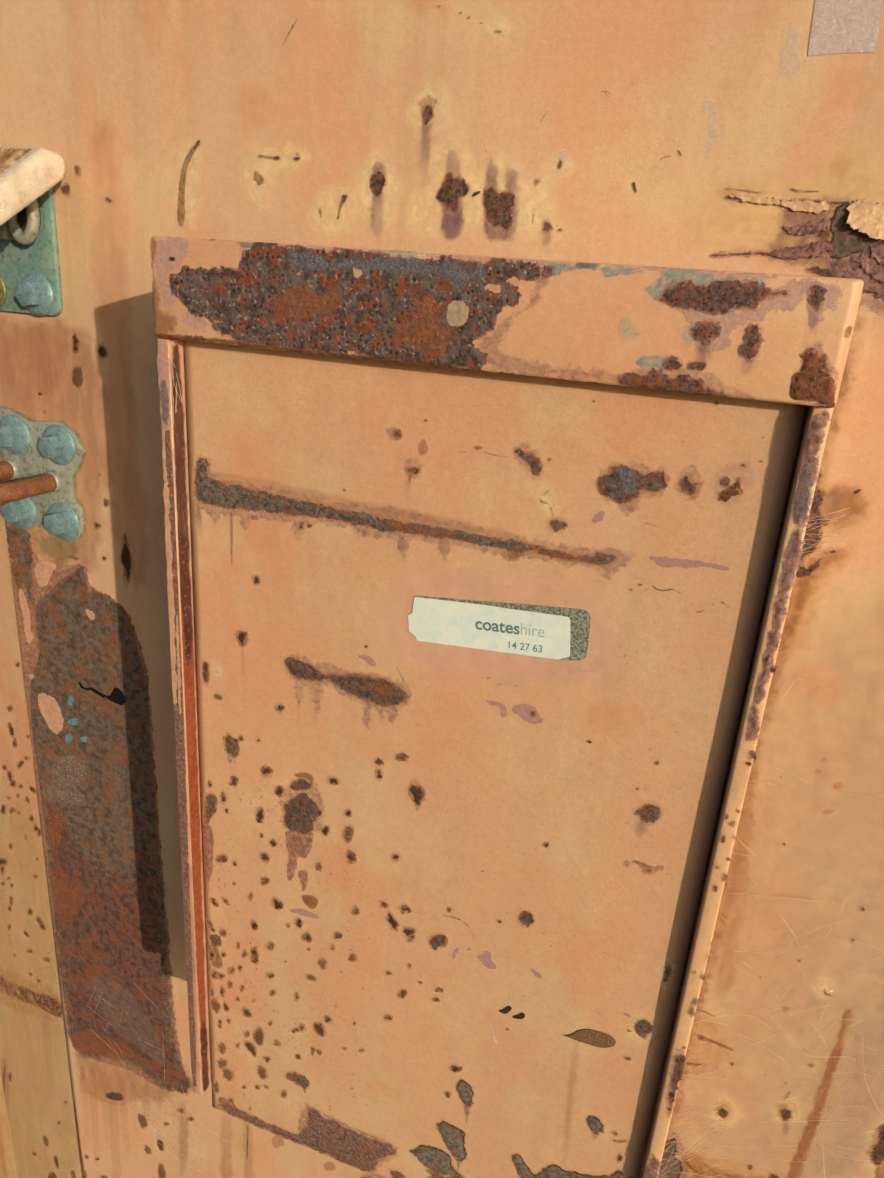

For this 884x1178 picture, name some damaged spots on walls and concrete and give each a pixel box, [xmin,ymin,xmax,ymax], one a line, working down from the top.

rust [369,168,386,199]
rust [436,172,516,239]
spalling [718,172,884,298]
rust [615,269,843,397]
rust [791,347,836,408]
rust [597,464,699,504]
rust [719,464,745,502]
rust [796,472,857,578]
rust [0,242,626,1178]
rust [668,1047,706,1123]
rust [788,1010,850,1178]
rust [644,1138,712,1178]